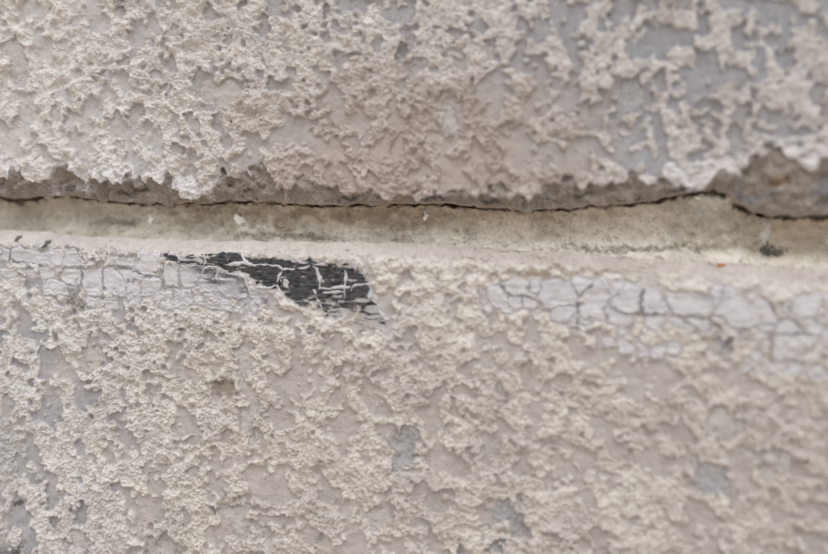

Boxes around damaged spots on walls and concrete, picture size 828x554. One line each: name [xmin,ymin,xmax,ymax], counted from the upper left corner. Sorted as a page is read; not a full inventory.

spalling [0,132,828,216]
crack [0,189,828,222]
crack [9,245,204,299]
peeling [0,240,396,332]
crack [499,281,593,329]
crack [606,288,712,326]
crack [767,301,828,362]